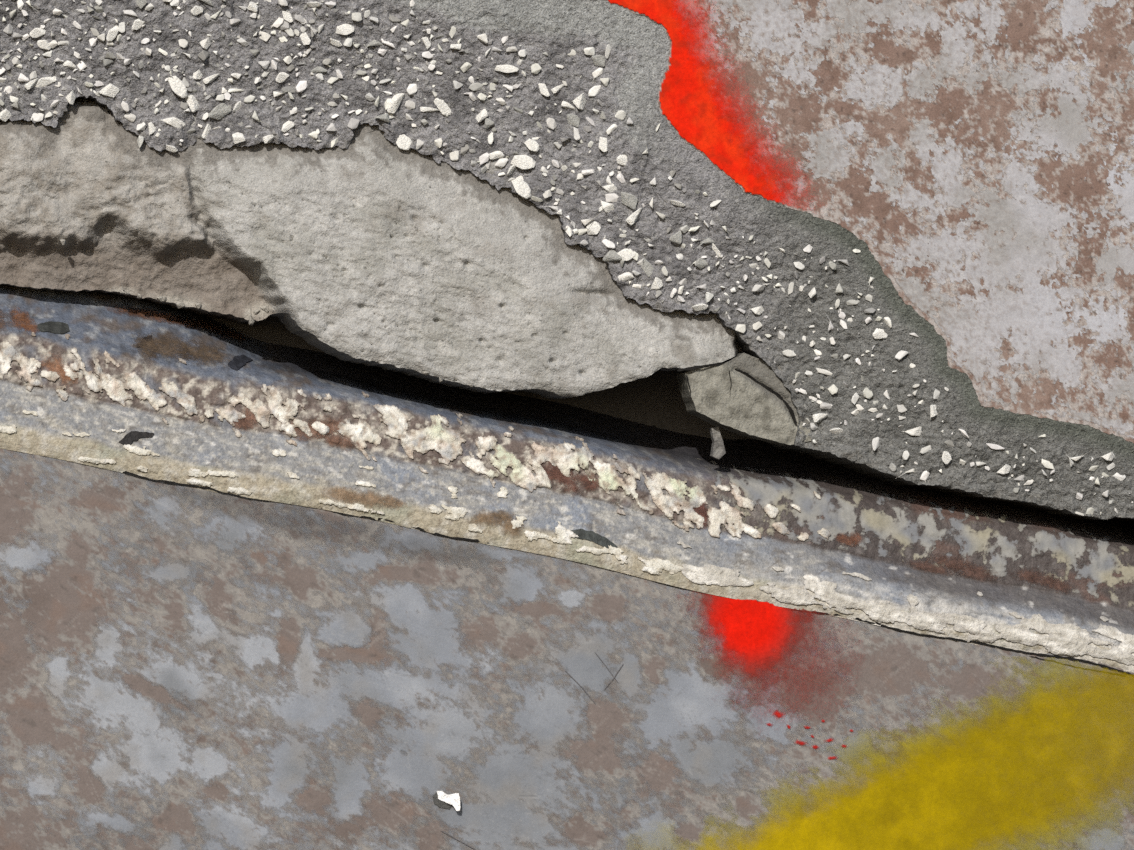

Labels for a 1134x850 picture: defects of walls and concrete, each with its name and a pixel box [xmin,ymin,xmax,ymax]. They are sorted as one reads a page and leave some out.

spalling [0,0,1134,608]
crack [677,363,797,426]
corrosion [542,462,599,491]
corrosion [328,487,403,507]
corrosion [472,511,520,534]
corrosion [694,503,707,525]
corrosion [837,534,861,545]
peeling [0,429,1134,850]